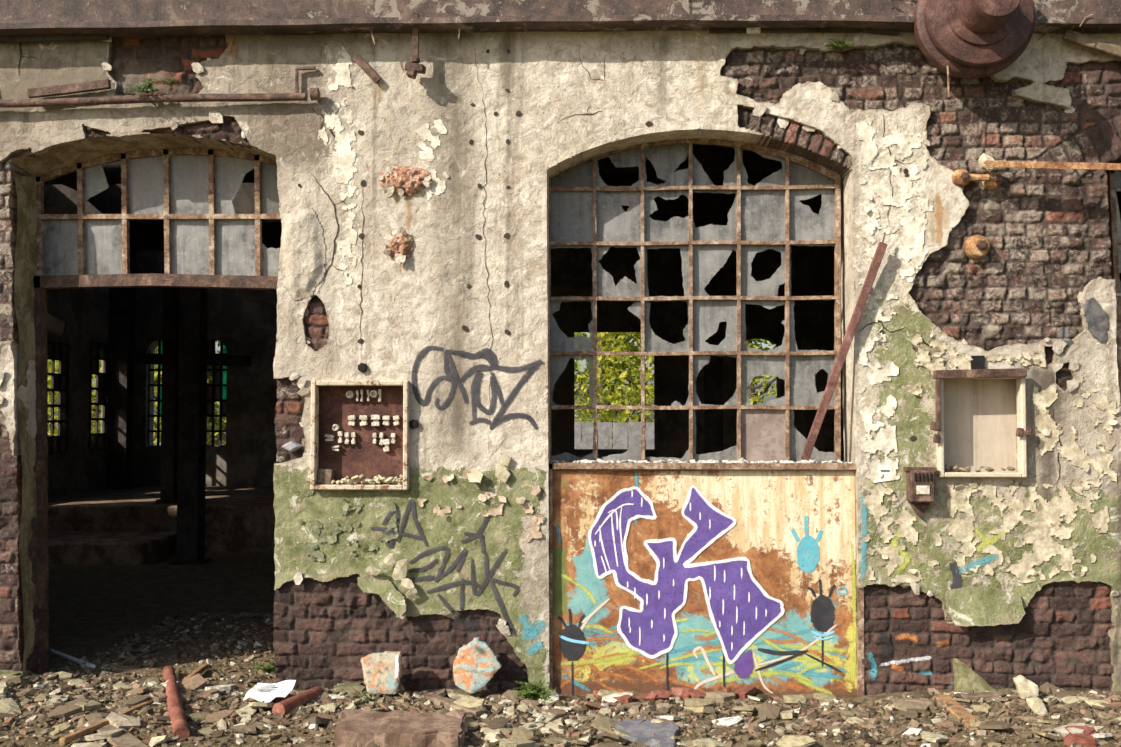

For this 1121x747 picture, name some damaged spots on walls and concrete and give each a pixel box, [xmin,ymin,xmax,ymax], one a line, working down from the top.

flaking render [86,127,111,138]
flaking render [149,110,259,155]
flaking render [302,293,329,351]
crack [311,173,364,346]
crack [472,43,494,450]
flaking render [720,43,1121,696]
peeling [421,452,545,542]
flaking render [273,498,528,692]